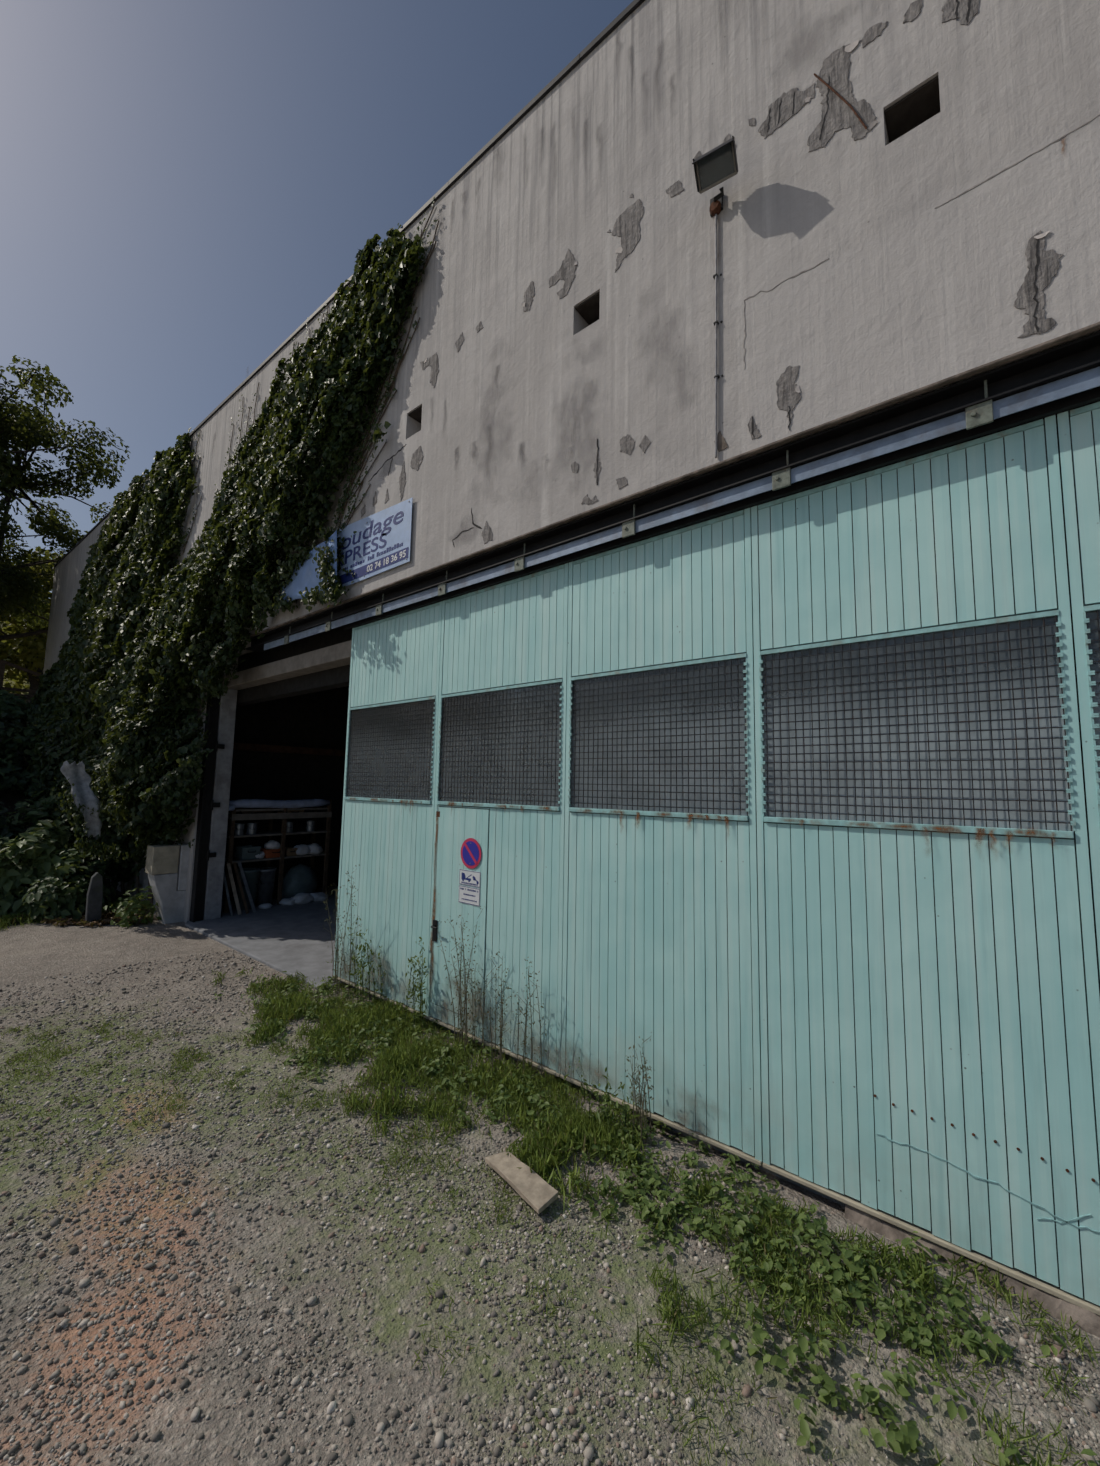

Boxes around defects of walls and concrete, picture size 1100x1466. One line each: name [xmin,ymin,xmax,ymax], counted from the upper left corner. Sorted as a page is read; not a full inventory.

peeling [942,0,979,26]
peeling [748,0,922,152]
peeling [666,180,684,197]
crack [935,114,1100,208]
peeling [607,194,644,273]
peeling [522,249,578,312]
peeling [1014,230,1063,338]
peeling [776,365,801,430]